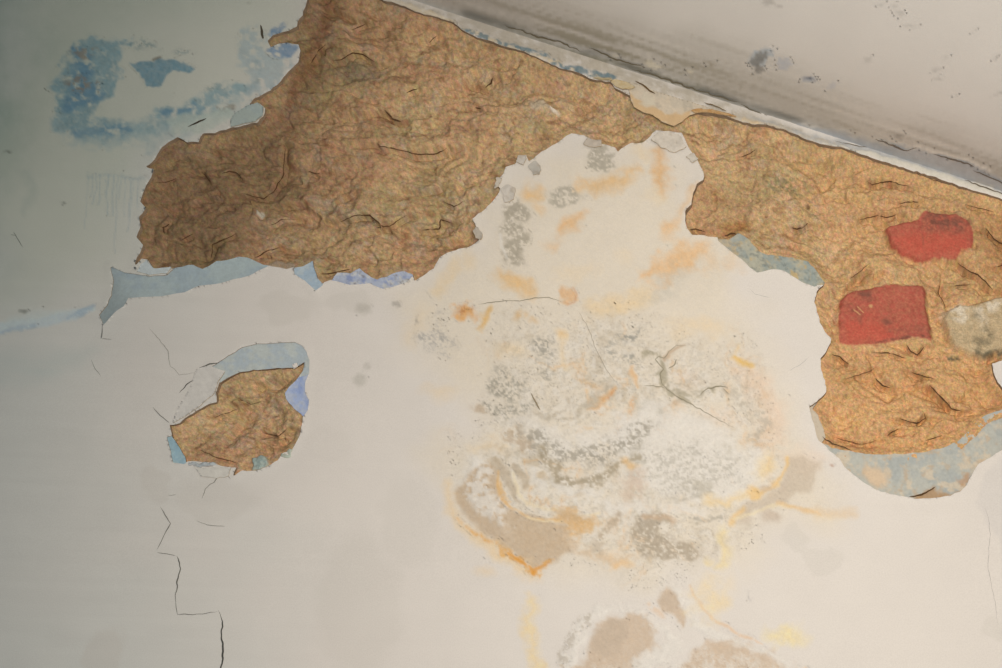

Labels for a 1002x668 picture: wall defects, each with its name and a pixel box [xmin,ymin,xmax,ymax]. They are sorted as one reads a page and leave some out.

crack [157,495,224,668]
flaking render [44,0,1002,499]
water stain [366,133,861,668]